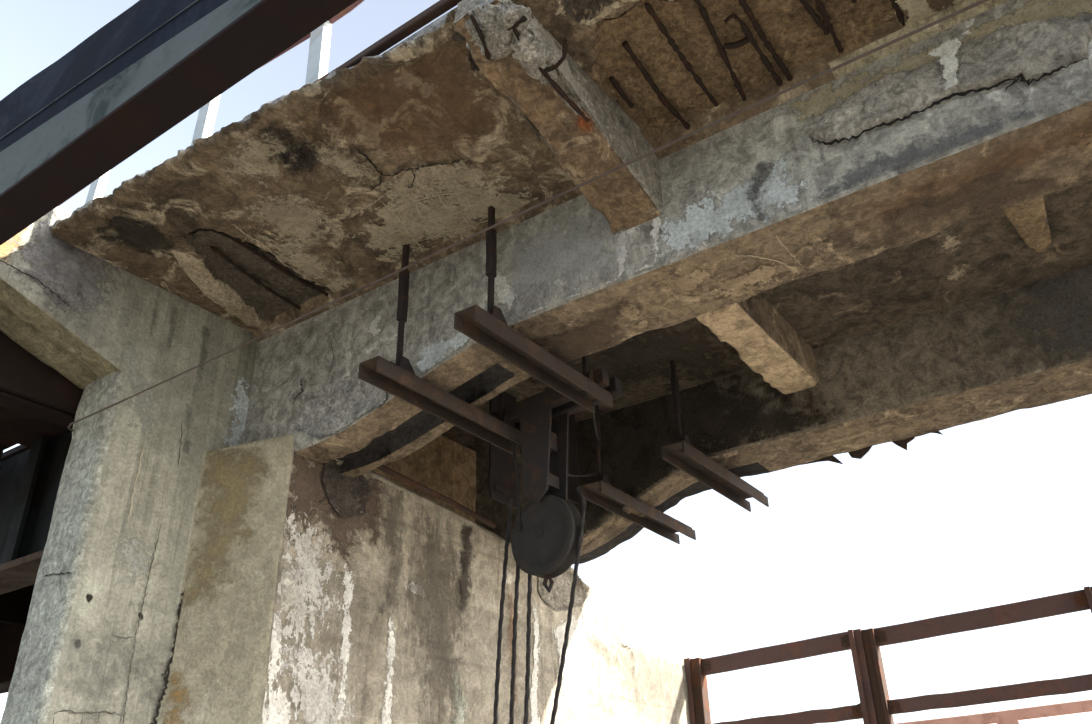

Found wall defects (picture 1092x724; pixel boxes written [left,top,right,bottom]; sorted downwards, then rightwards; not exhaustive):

damp [580,0,636,26]
spalling [562,0,962,142]
peeling [781,0,1092,142]
crack [809,58,1088,145]
damp [220,122,538,292]
spalling [171,229,331,327]
crack [128,446,144,521]
crack [53,515,164,724]
crack [150,587,185,724]
damp [262,450,474,724]
damp [530,605,597,724]
spalling [538,571,591,612]